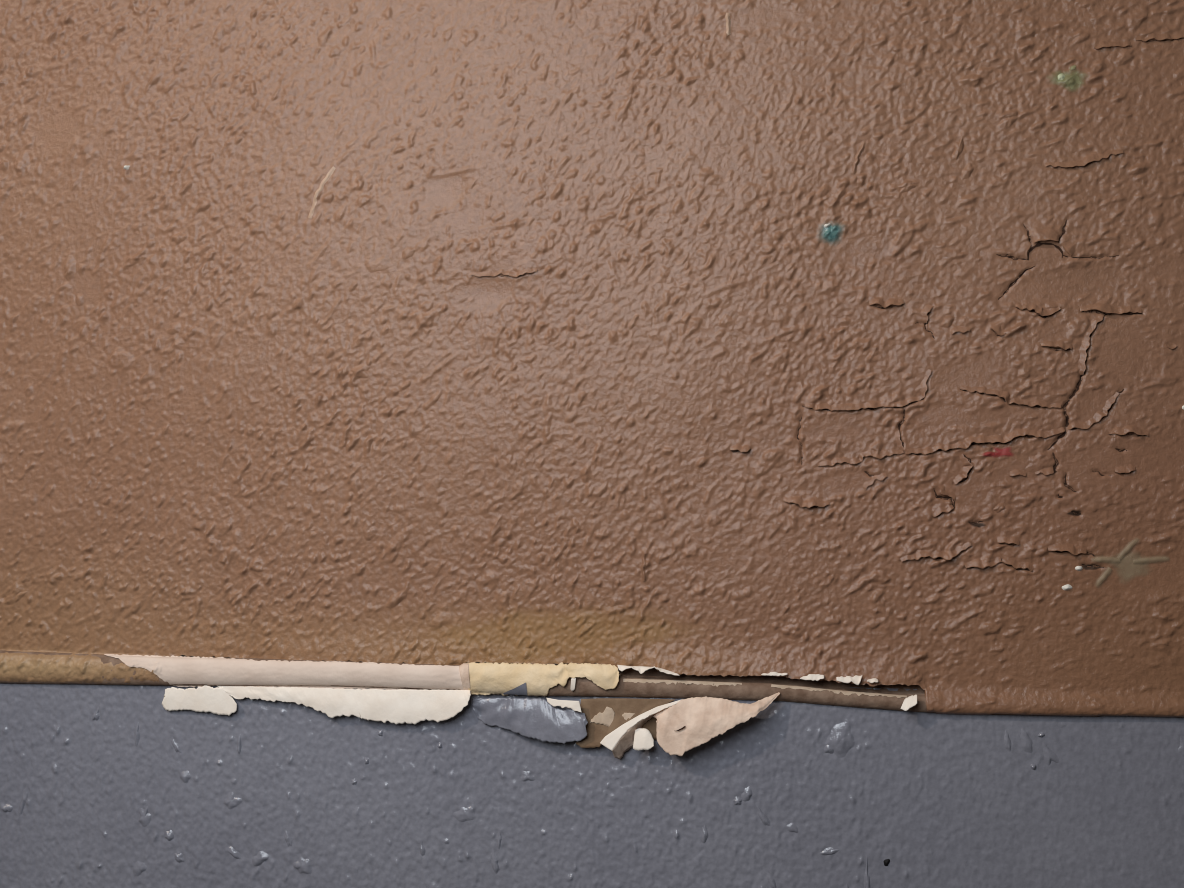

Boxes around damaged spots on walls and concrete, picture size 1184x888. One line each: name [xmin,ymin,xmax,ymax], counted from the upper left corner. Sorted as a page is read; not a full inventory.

crack [469,268,537,277]
crack [797,220,1149,571]
peeling [104,654,926,759]